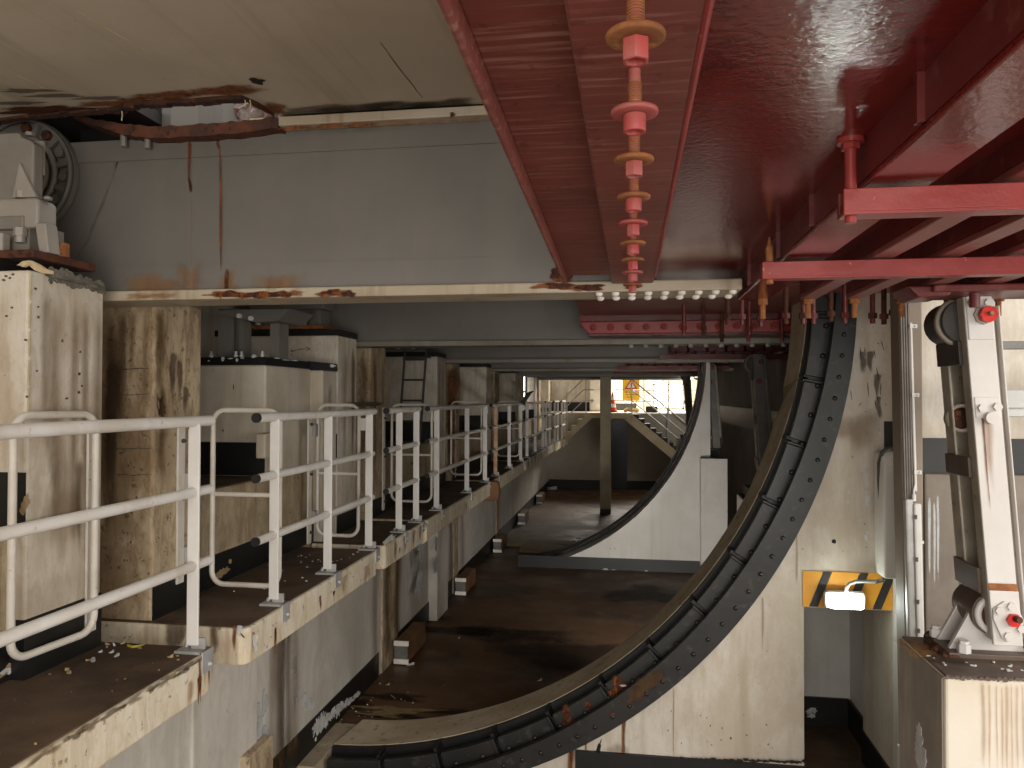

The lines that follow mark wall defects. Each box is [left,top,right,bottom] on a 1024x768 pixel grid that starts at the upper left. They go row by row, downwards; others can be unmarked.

corrosion [0,85,285,124]
corrosion [203,140,302,300]
corrosion [316,289,356,298]
corrosion [531,268,604,291]
corrosion [608,671,662,701]